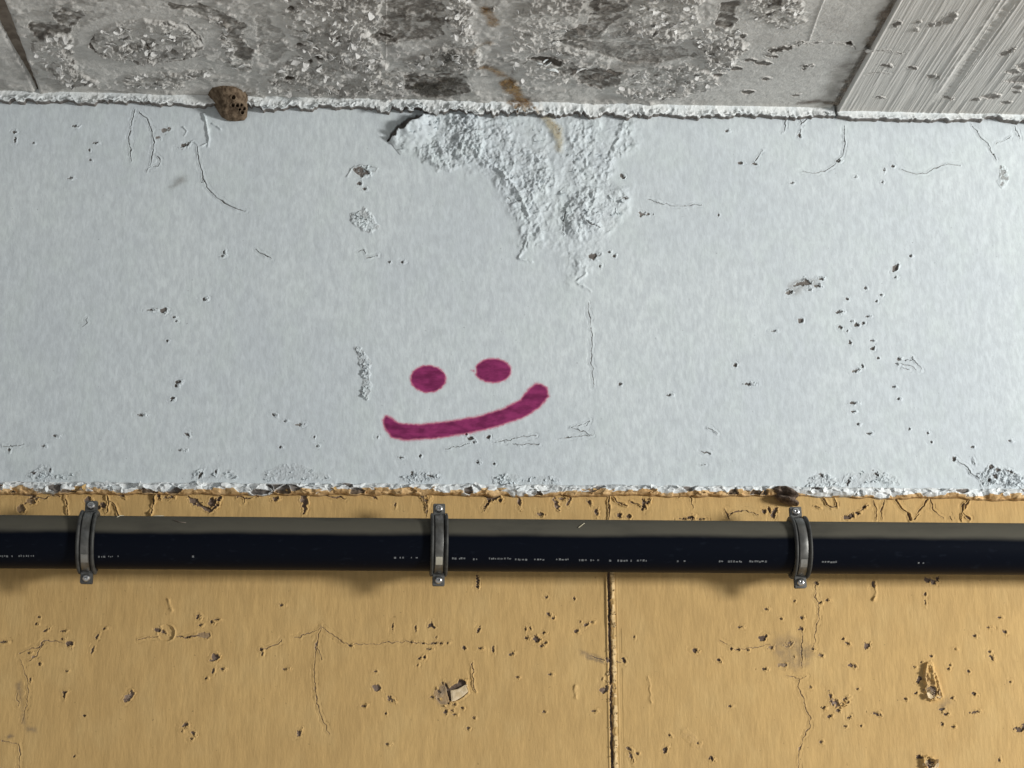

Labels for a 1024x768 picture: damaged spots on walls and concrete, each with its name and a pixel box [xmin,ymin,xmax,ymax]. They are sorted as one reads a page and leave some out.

crack [125,106,163,175]
crack [193,143,250,214]
peeling [0,0,810,294]
corrosion [481,66,562,147]
crack [810,455,1024,523]
crack [0,636,76,768]
crack [256,620,479,740]
spalling [424,676,479,733]
crack [718,580,823,768]
peeling [898,645,984,731]
peeling [966,614,1010,664]